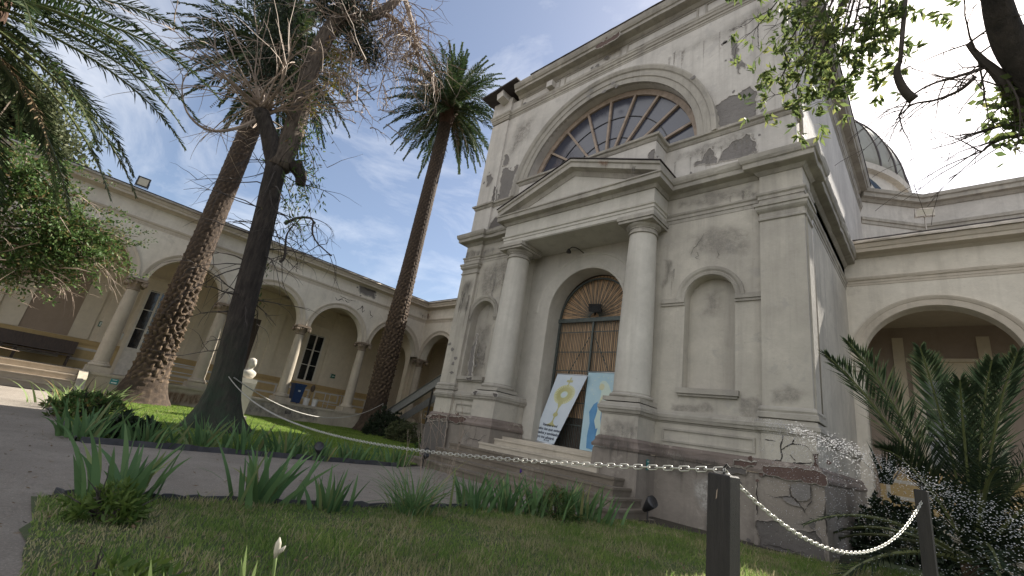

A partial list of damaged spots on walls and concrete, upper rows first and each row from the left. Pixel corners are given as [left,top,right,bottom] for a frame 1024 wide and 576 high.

flaking render [715,85,766,127]
flaking render [690,133,761,174]
flaking render [483,154,519,201]
spalling [721,452,831,508]
crack [756,435,828,536]